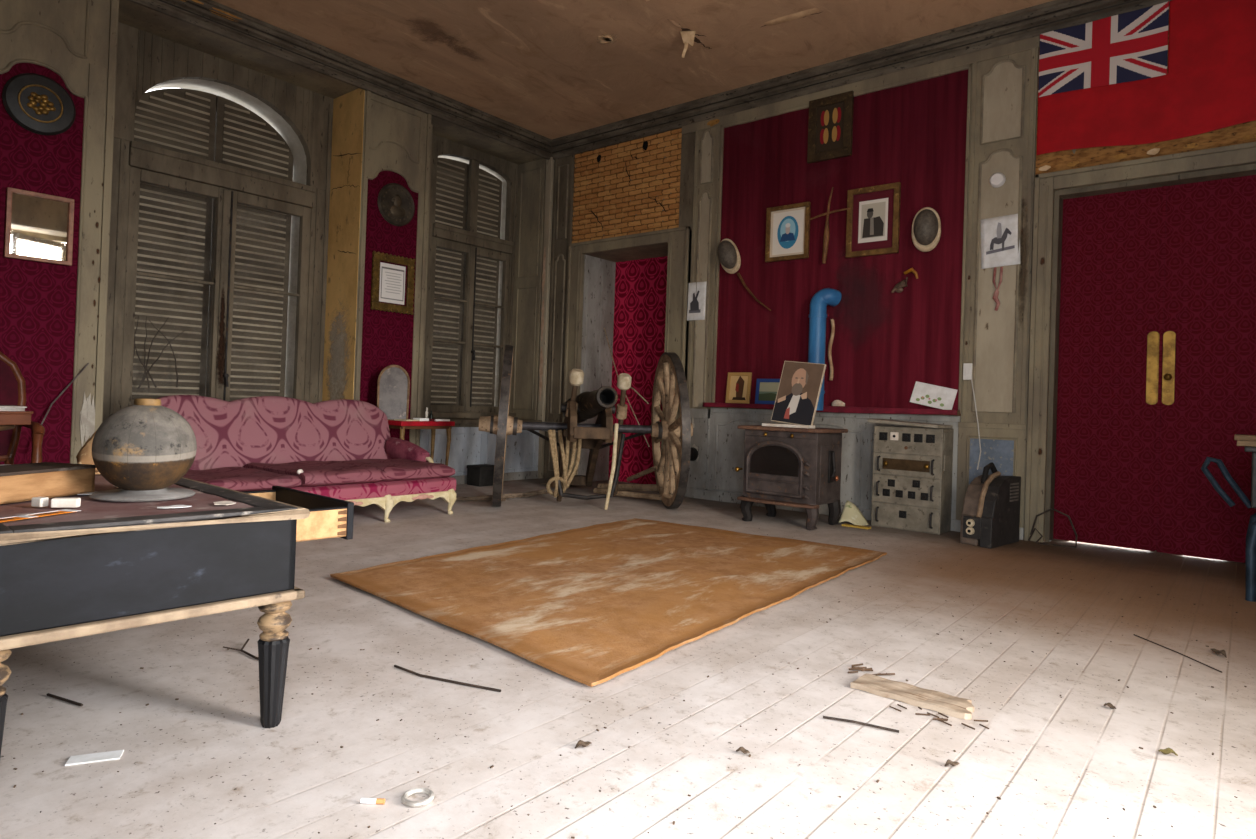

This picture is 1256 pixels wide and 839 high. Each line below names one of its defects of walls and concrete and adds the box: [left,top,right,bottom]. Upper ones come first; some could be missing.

peeling [667,19,712,58]